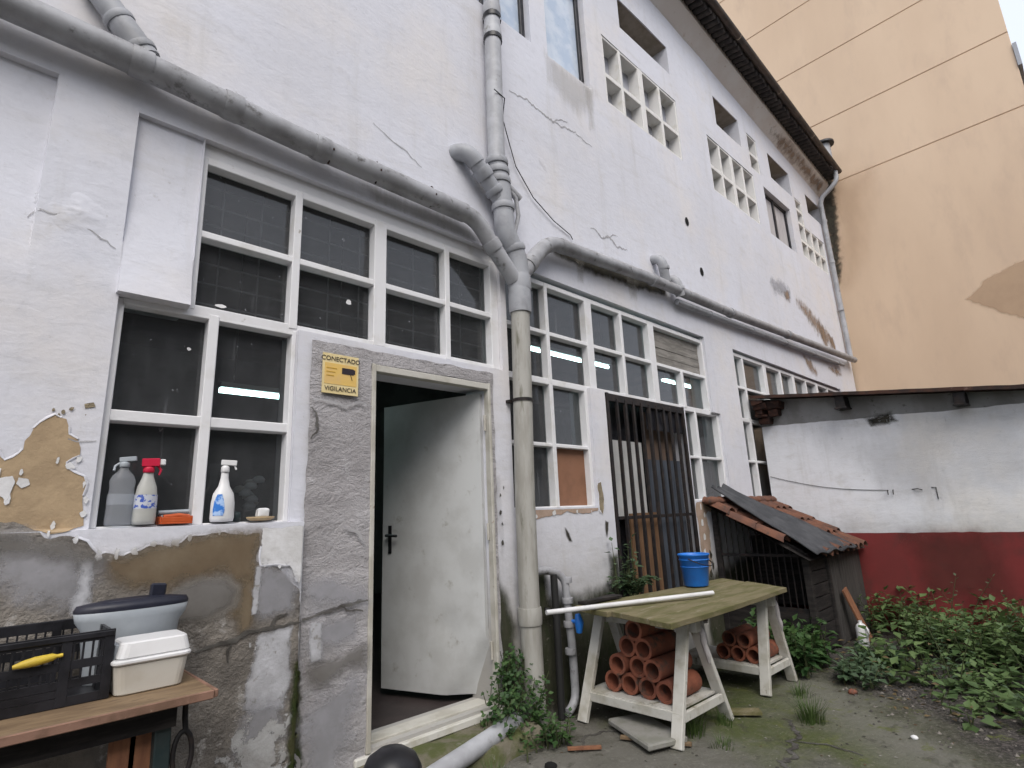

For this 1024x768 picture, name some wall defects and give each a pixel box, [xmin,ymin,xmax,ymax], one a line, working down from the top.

crack [509,90,592,147]
crack [592,228,627,250]
leakage [773,282,790,299]
peeling [536,478,608,536]
peeling [0,402,229,689]
peeling [165,525,304,768]
crack [195,599,368,663]
peeling [12,743,108,768]